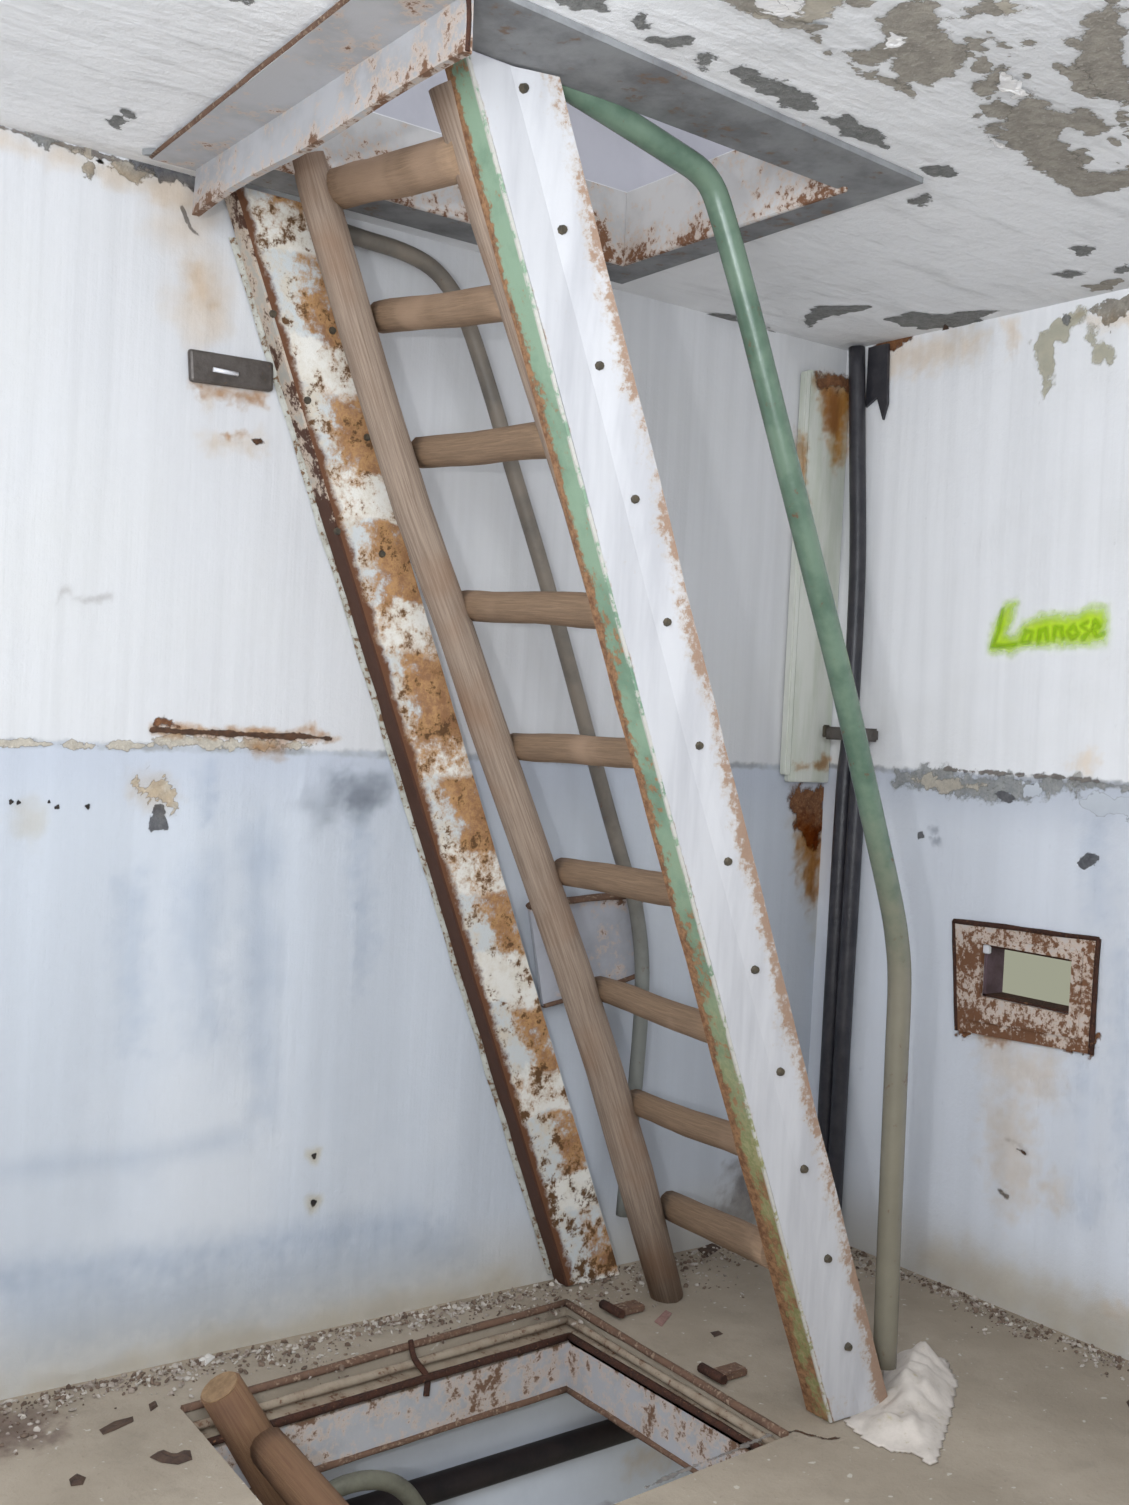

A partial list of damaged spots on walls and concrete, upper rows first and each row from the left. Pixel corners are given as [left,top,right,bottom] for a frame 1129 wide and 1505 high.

peeling [555,0,611,13]
rust [149,0,350,159]
peeling [631,13,890,150]
peeling [720,0,1129,197]
peeling [804,306,997,331]
peeling [1034,245,1129,397]
rust [815,371,849,432]
spalling [131,774,179,832]
rust [787,782,824,890]
spalling [891,763,1129,803]
rust [952,919,1101,1059]
rust [315,1386,699,1473]